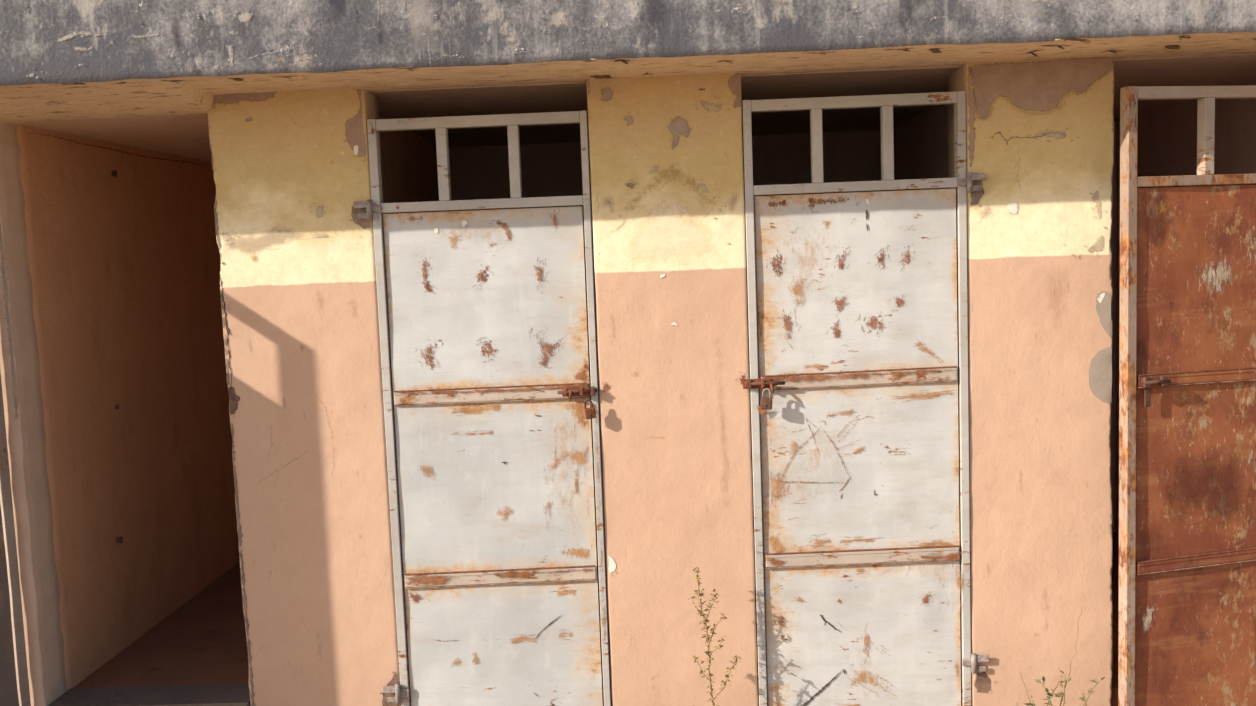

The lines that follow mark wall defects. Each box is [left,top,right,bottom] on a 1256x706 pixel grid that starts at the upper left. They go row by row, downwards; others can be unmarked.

damp [58,31,91,66]
peeling [344,89,368,162]
spalling [666,73,742,149]
spalling [968,38,1113,167]
corrosion [471,210,514,288]
corrosion [831,288,849,338]
corrosion [855,294,904,334]
corrosion [416,339,443,370]
corrosion [398,362,611,416]
corrosion [762,340,960,402]
corrosion [482,545,602,595]
corrosion [906,541,963,613]